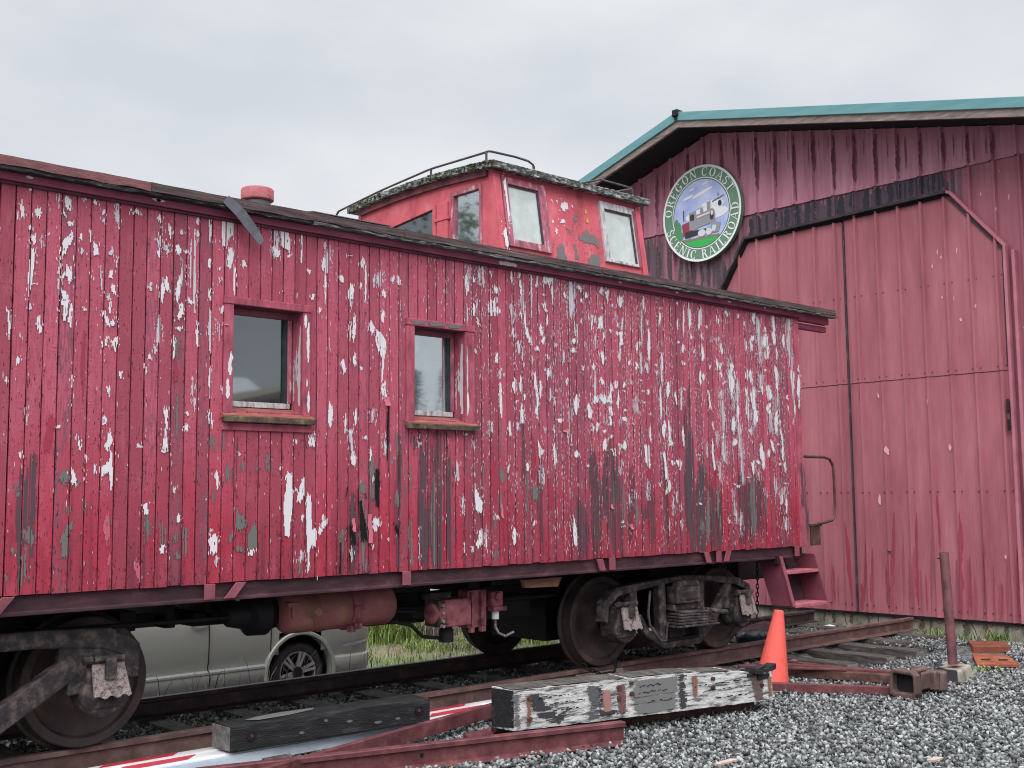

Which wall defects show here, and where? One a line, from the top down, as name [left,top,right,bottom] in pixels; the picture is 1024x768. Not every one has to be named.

peeling [17,176,107,328]
peeling [54,415,119,490]
peeling [156,276,224,361]
peeling [206,368,347,579]
peeling [341,275,401,400]
damp [397,430,457,569]
peeling [463,175,685,562]
damp [577,439,669,559]
damp [684,386,723,552]
peeling [676,291,801,542]
damp [640,133,922,289]
damp [937,132,995,168]